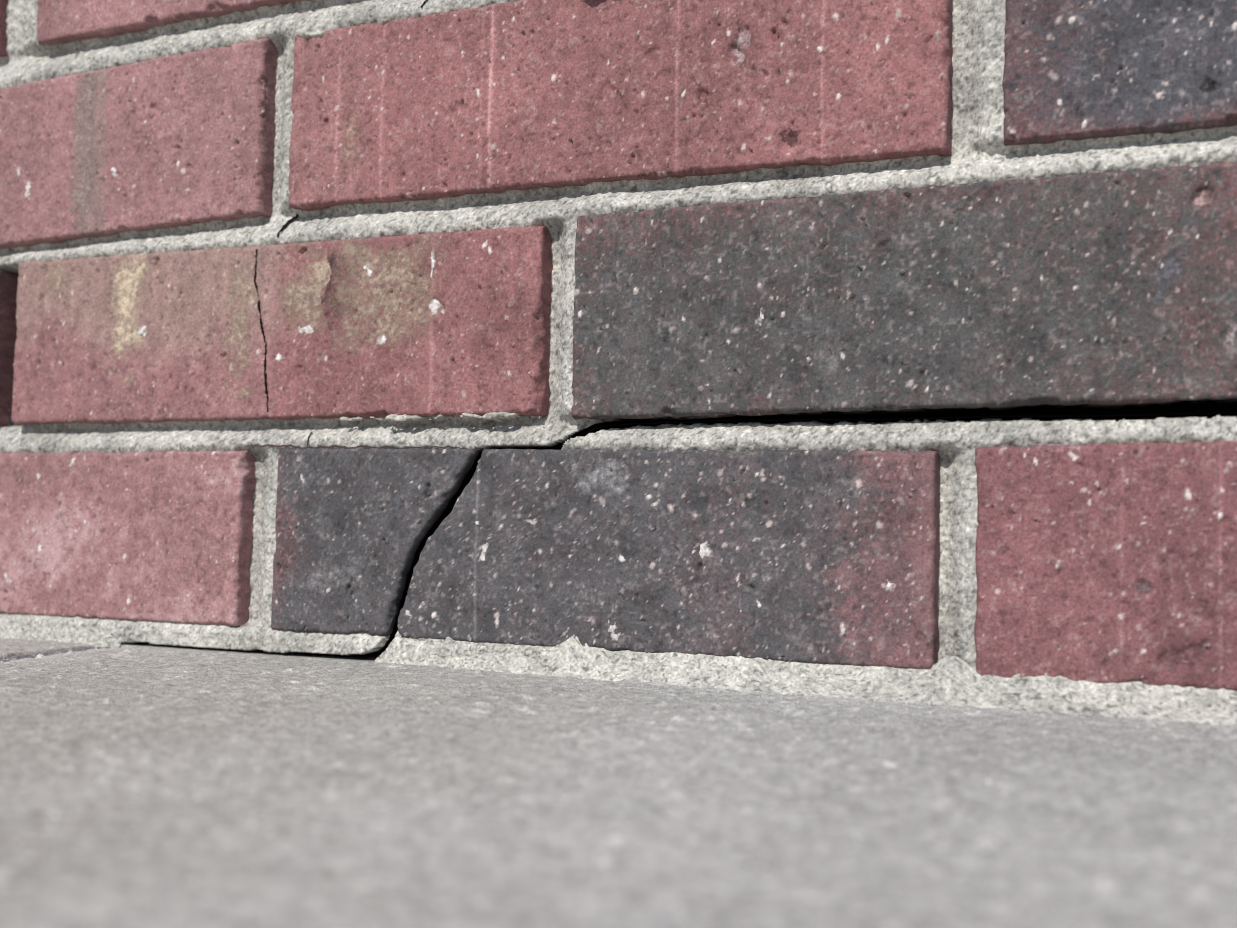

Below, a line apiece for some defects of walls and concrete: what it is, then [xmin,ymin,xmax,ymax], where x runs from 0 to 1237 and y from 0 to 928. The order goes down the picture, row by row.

crack [246,214,1237,657]